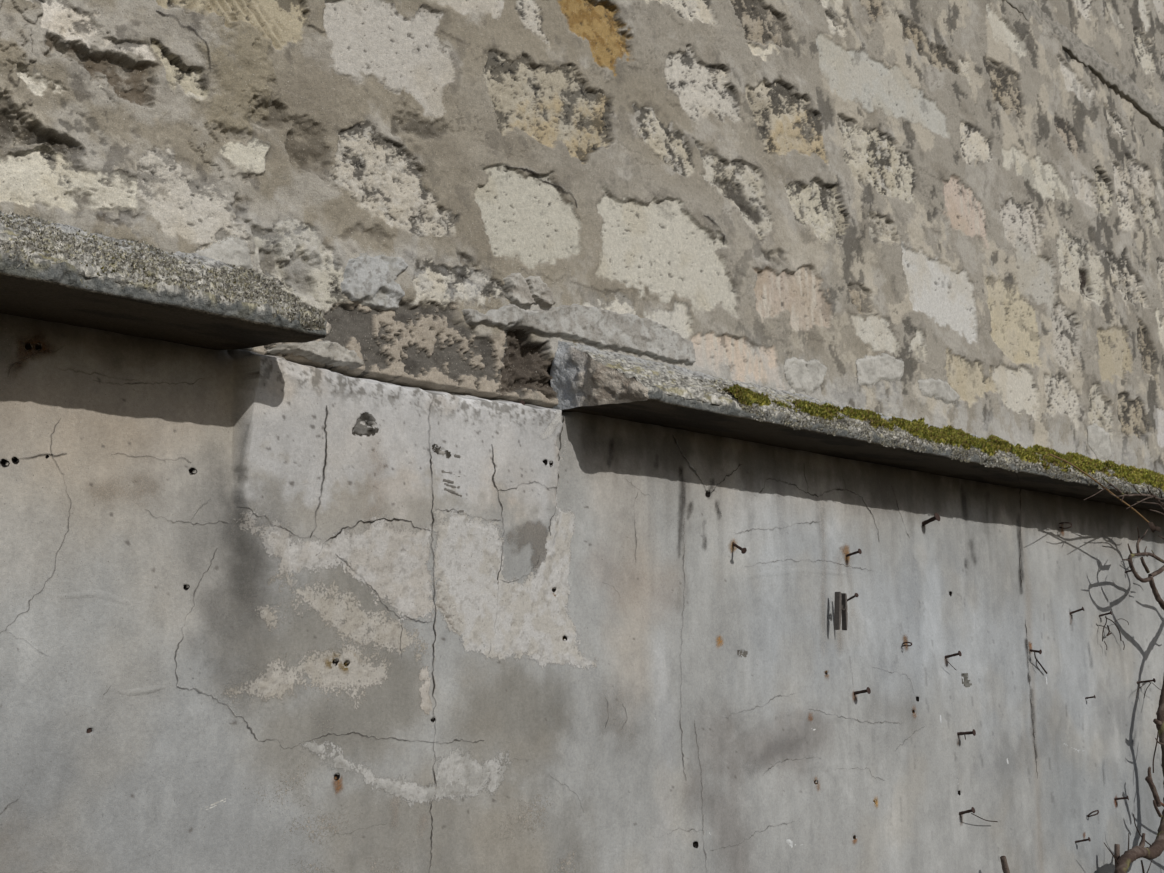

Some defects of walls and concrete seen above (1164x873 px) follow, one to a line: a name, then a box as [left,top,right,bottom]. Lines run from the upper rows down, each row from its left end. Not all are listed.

spalling [352,412,379,436]
crack [286,405,448,559]
crack [492,415,565,536]
crack [369,566,436,708]
peeling [224,508,599,716]
peeling [299,739,513,808]
crack [430,739,484,862]
crack [680,720,703,790]